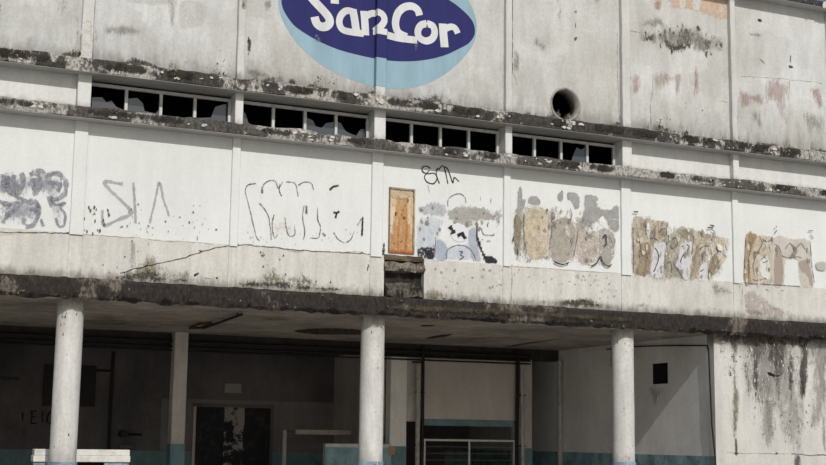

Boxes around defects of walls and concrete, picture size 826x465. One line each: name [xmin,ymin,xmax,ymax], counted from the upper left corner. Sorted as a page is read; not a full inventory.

leakage [117,57,157,67]
leakage [644,18,722,57]
crack [0,232,370,273]
peeling [516,187,619,262]
peeling [637,220,721,278]
peeling [745,236,810,287]
leakage [563,299,601,308]
leakage [715,334,826,456]